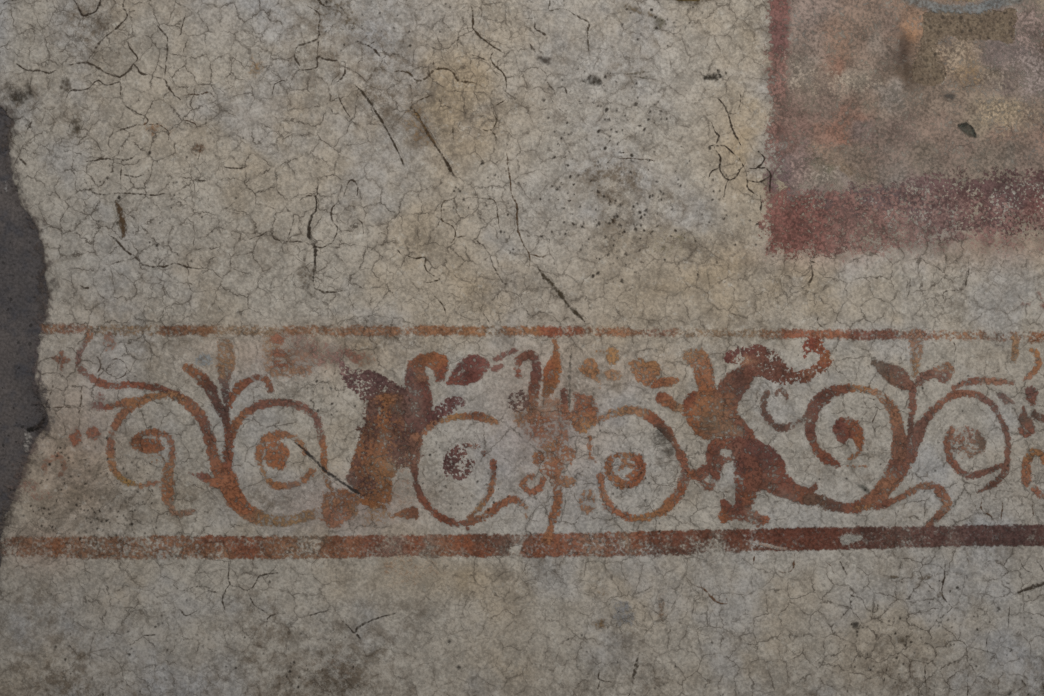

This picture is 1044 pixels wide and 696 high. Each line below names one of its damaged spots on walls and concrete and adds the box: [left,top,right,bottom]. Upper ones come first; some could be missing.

crack [530,1,590,50]
crack [272,0,350,116]
crack [17,0,214,181]
crack [87,157,164,196]
crack [357,10,544,284]
crack [709,95,772,209]
crack [111,236,200,269]
crack [251,179,446,311]
crack [46,358,127,412]
crack [213,572,278,620]
crack [346,613,395,638]